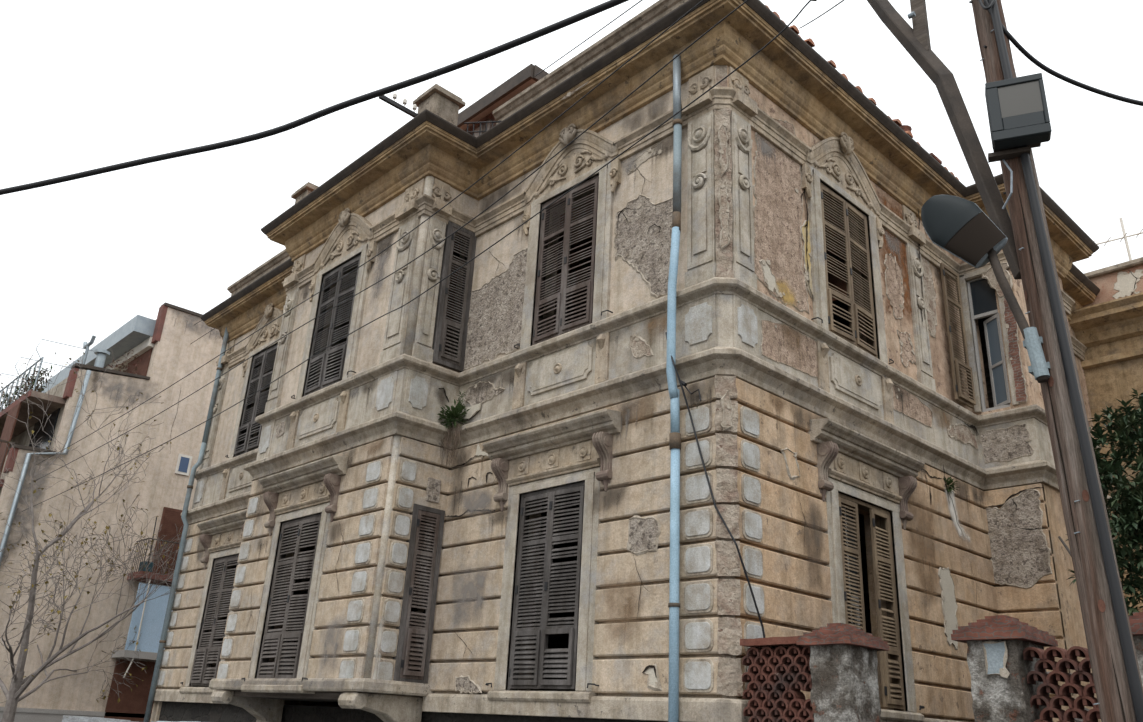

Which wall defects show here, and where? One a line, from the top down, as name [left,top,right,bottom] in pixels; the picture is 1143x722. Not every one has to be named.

peeling [627,143,662,175]
peeling [614,193,673,299]
peeling [753,132,813,314]
peeling [463,247,528,371]
spalling [460,381,505,421]
peeling [985,488,1053,589]